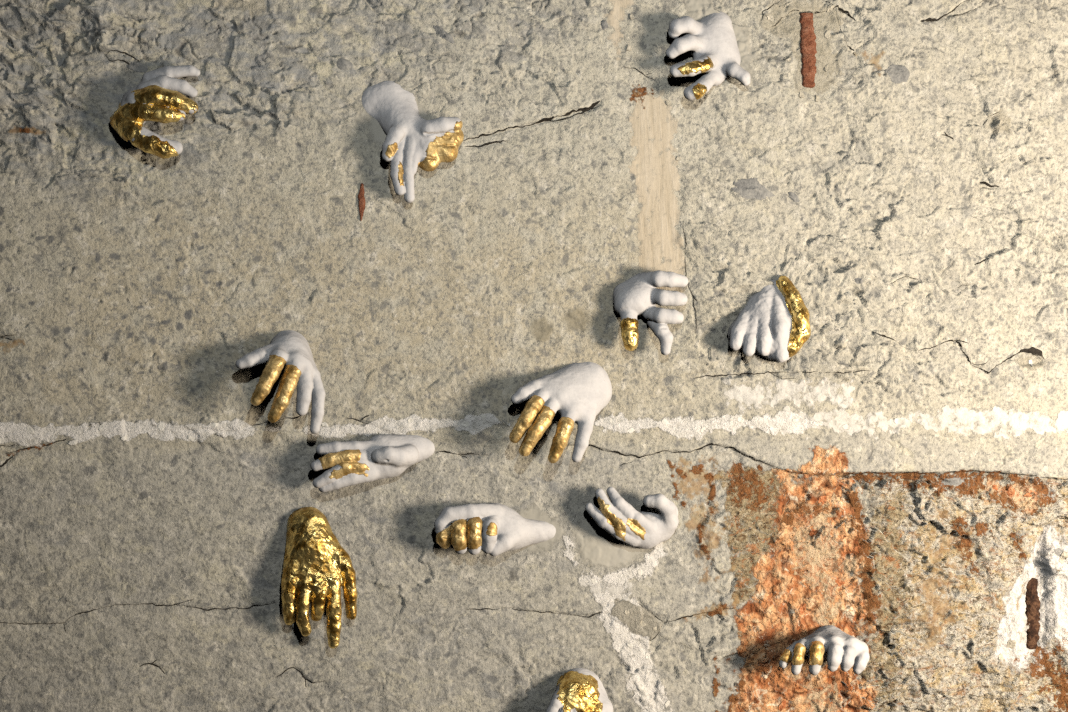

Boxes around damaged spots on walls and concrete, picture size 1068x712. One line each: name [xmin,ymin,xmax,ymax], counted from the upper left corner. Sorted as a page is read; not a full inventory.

crack [464,101,600,147]
crack [874,332,1018,374]
crack [588,443,804,480]
crack [832,470,1068,480]
flaking render [940,477,965,486]
crack [0,599,275,632]
rust [709,446,1057,712]
spalling [990,525,1068,672]